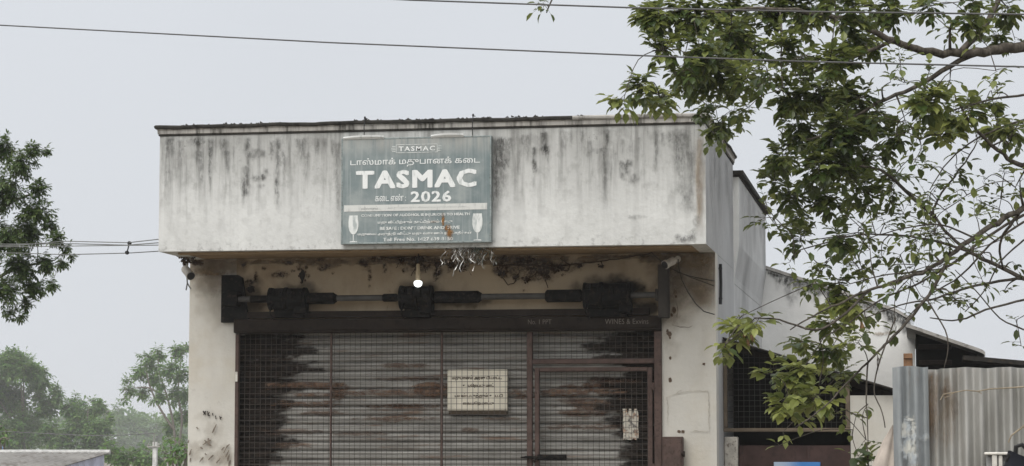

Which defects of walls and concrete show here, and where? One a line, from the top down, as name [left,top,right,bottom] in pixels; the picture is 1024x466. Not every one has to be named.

corrosion [266,363,447,422]
corrosion [509,377,640,429]